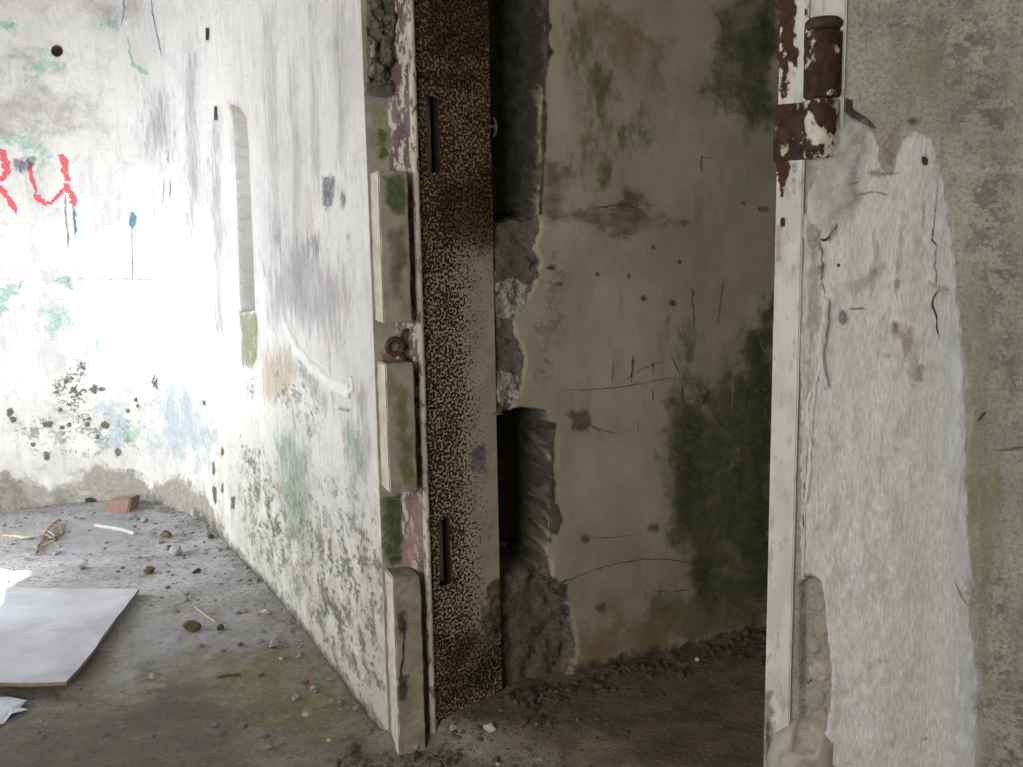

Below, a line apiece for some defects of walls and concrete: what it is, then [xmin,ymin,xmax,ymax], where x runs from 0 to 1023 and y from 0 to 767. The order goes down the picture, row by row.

corrosion [776,0,799,99]
spalling [493,0,554,414]
corrosion [775,161,790,197]
crack [931,160,949,337]
mould [7,362,128,461]
leakage [0,447,381,647]
spalling [499,538,576,686]
spalling [527,421,563,543]